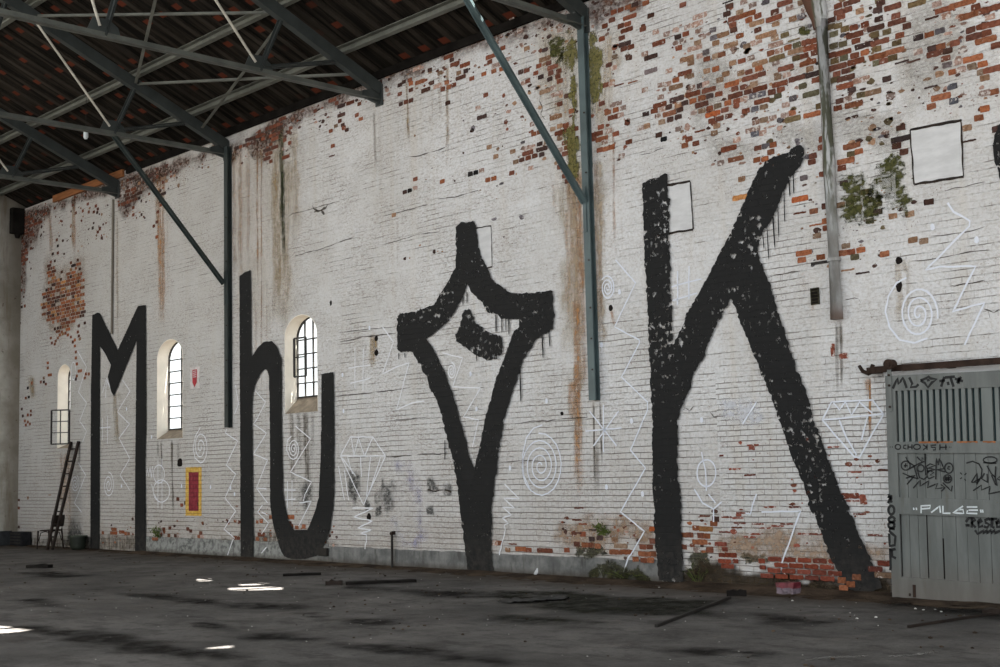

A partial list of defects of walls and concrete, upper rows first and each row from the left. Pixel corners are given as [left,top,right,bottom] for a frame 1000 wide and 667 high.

peeling [235,94,367,164]
peeling [379,17,579,199]
peeling [590,0,1000,275]
peeling [20,156,209,381]
peeling [21,361,52,426]
corrosion [563,300,581,463]
peeling [830,343,848,359]
peeling [841,455,888,517]
peeling [492,507,656,563]
peeling [681,509,891,591]